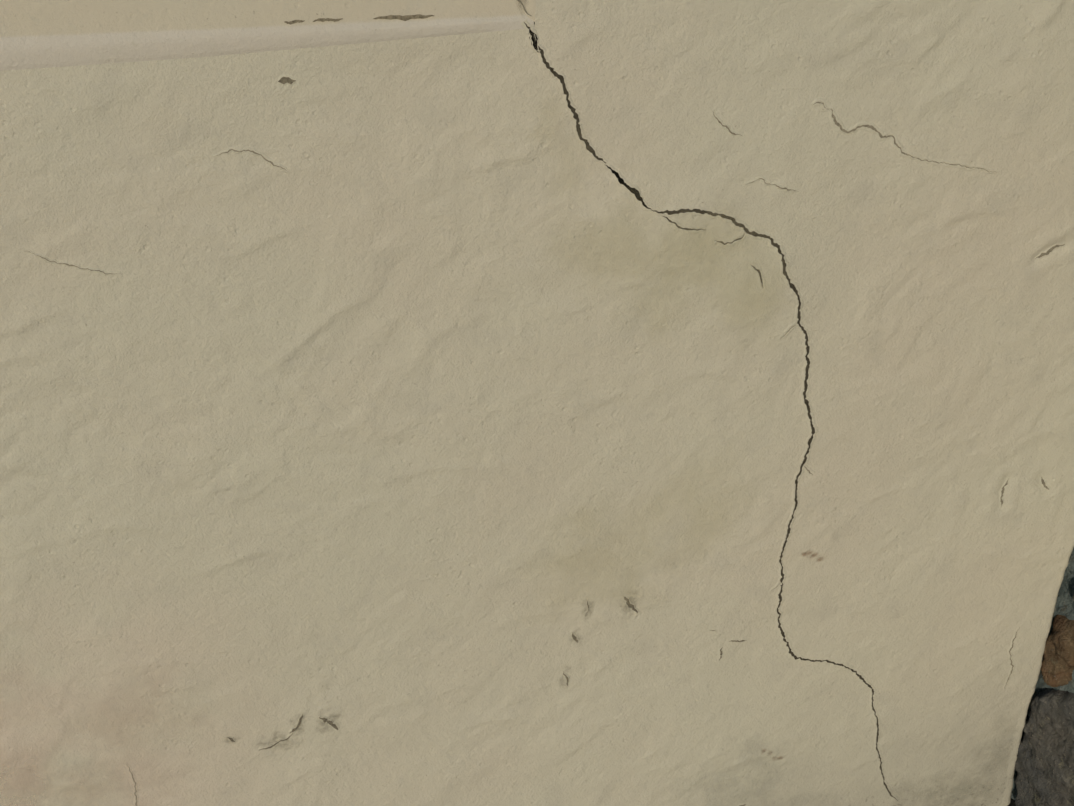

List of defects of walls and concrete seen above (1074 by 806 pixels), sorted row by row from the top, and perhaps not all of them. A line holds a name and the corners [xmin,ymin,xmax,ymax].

crack [517,0,900,802]
crack [812,98,998,175]